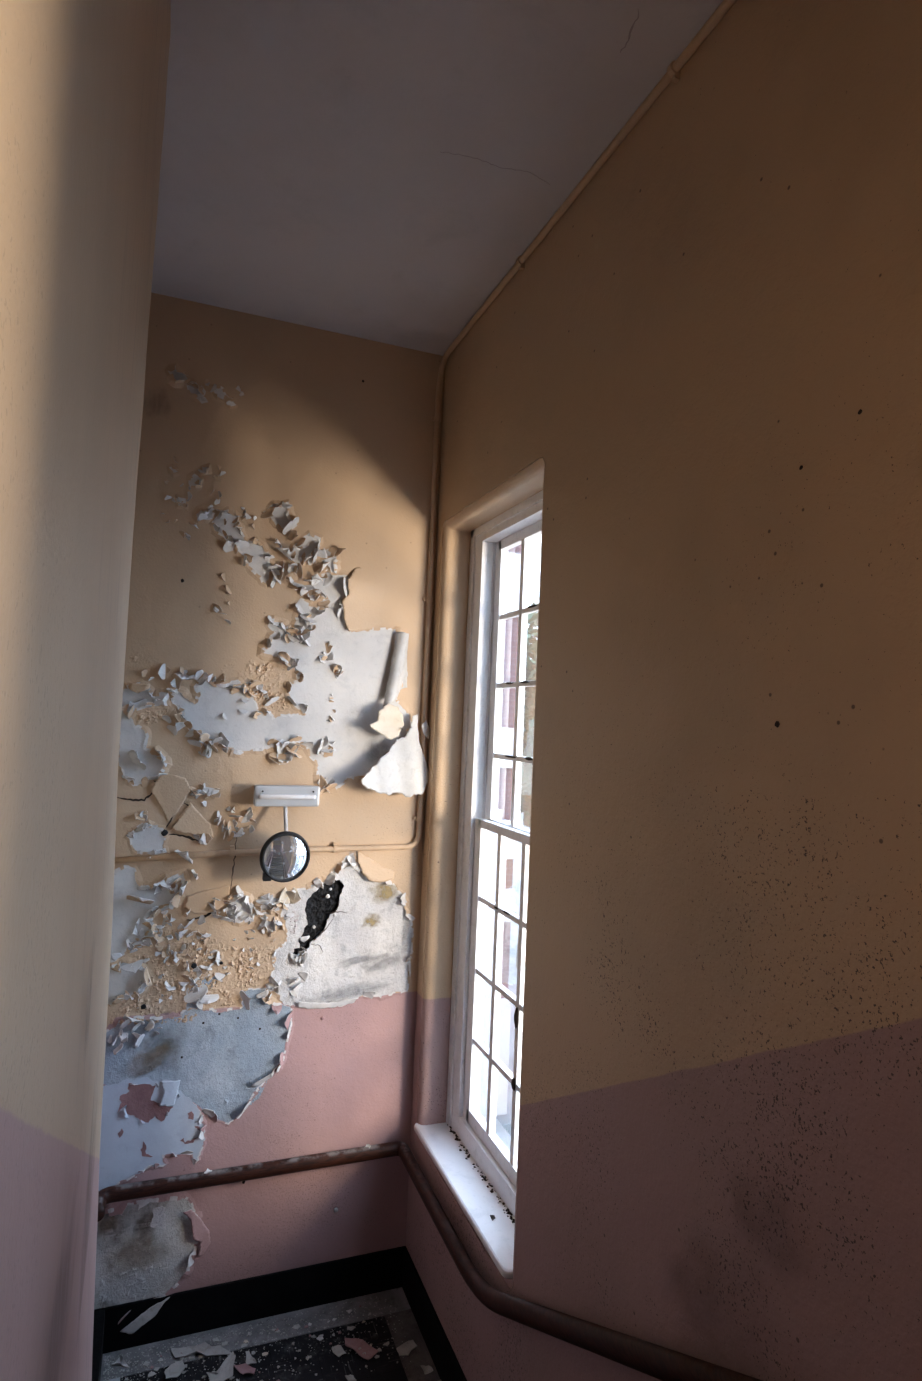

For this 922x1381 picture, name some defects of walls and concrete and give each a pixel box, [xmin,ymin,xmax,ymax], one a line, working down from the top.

peeling [118,456,430,797]
peeling [94,783,416,1334]